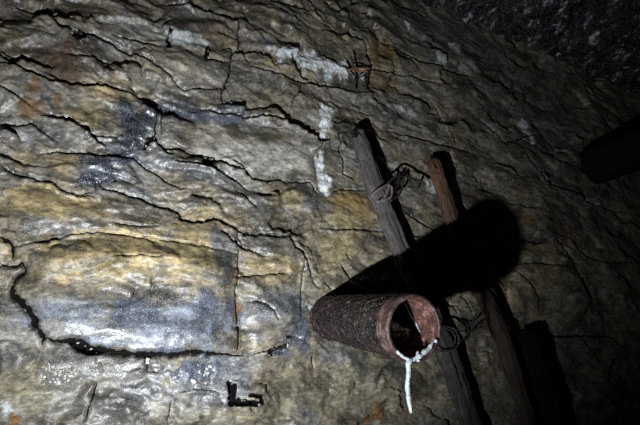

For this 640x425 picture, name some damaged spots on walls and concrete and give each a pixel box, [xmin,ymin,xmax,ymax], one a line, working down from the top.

crack [53,18,330,120]
crack [271,0,357,36]
water stain [266,45,364,80]
crack [1,114,112,157]
crack [117,89,314,206]
water stain [314,102,337,197]
crack [1,165,331,315]
crack [0,222,296,373]
crack [84,384,97,422]